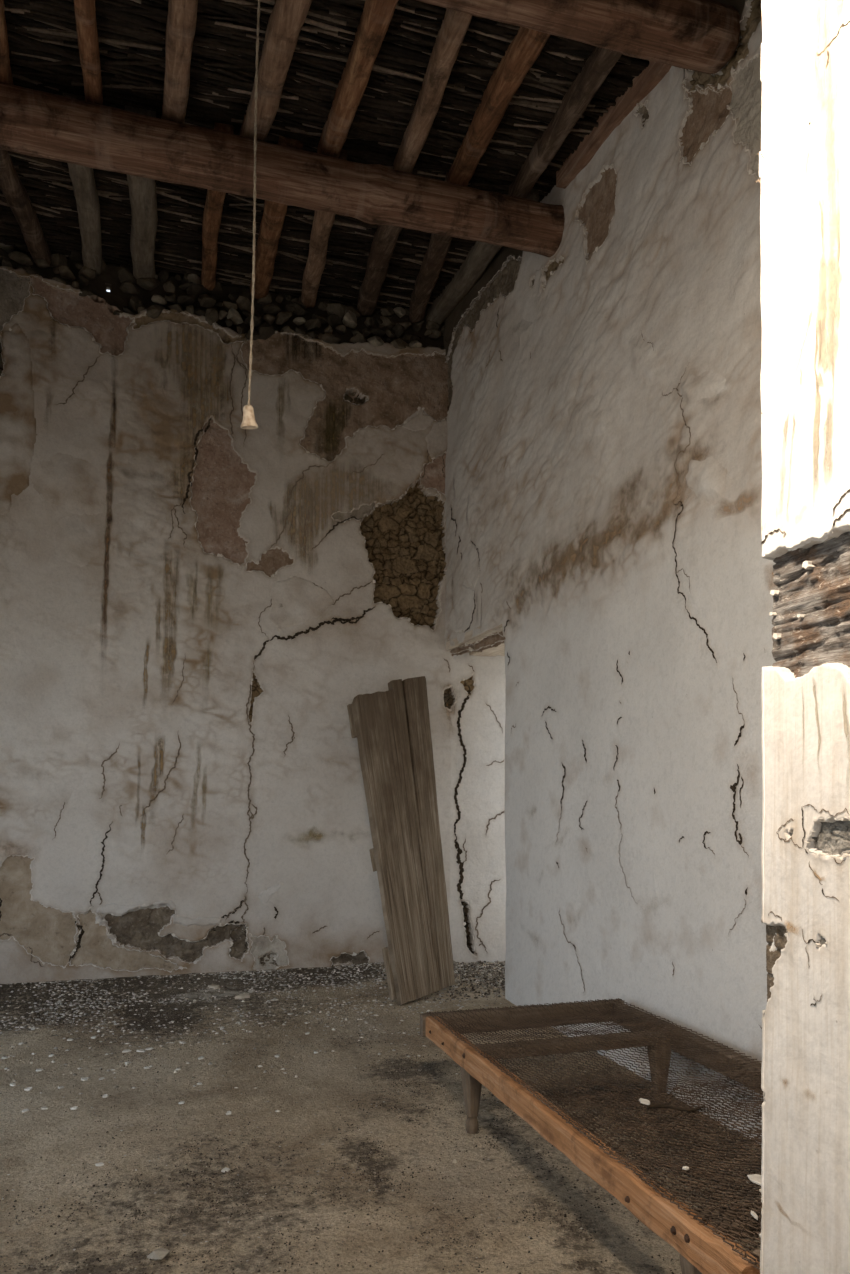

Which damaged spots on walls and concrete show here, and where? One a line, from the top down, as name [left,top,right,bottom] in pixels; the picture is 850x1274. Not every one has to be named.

flaking render [678,0,764,181]
water stain [799,0,843,480]
flaking render [0,255,564,515]
crack [0,735,181,967]
flaking render [0,855,290,972]
water stain [138,743,164,792]
water stain [143,554,178,695]
crack [206,581,376,952]
flaking render [331,453,447,631]
crack [444,651,635,954]
crack [662,363,822,1006]
flaking render [762,925,788,1013]